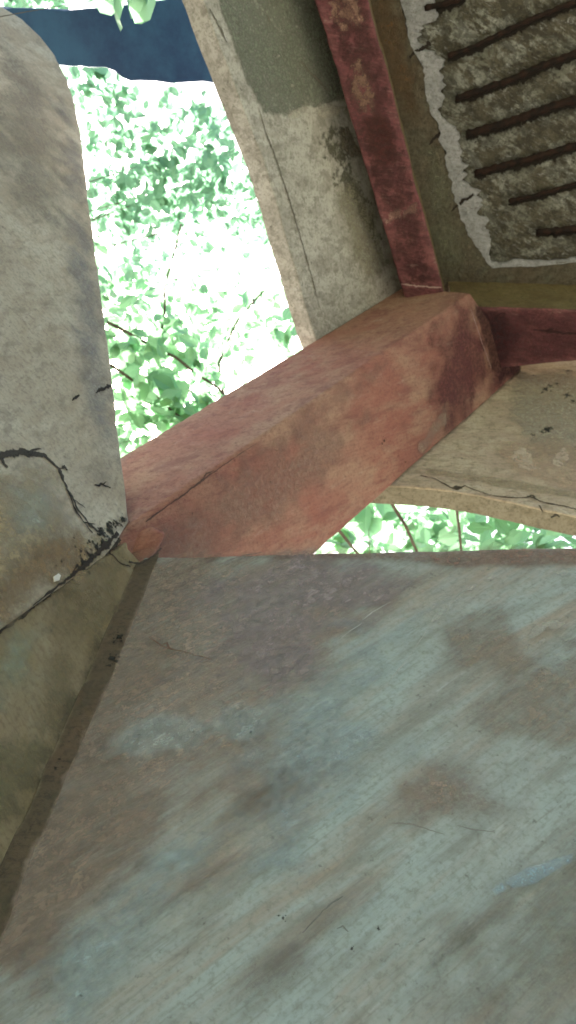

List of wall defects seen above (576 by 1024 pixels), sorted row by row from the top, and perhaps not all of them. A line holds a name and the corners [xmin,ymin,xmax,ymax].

spalling [400,0,576,268]
crack [0,448,161,634]
crack [420,475,575,518]